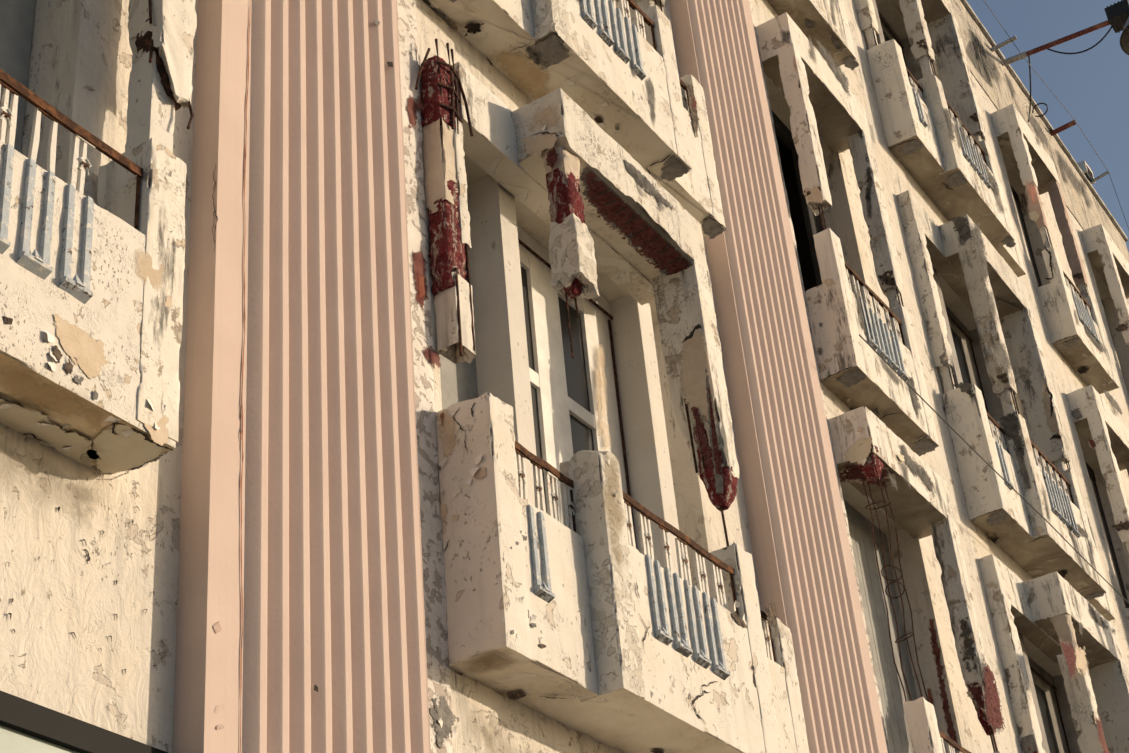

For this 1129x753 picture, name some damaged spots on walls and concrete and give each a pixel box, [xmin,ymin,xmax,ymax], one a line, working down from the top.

spalling [525,32,569,69]
corrosion [407,95,424,129]
spalling [646,154,689,182]
spalling [580,167,692,276]
corrosion [413,251,428,310]
corrosion [423,346,441,368]
crack [0,397,49,445]
peeling [0,396,169,474]
crack [111,422,173,480]
peeling [680,324,724,494]
spalling [839,427,930,703]
spalling [965,653,1006,752]